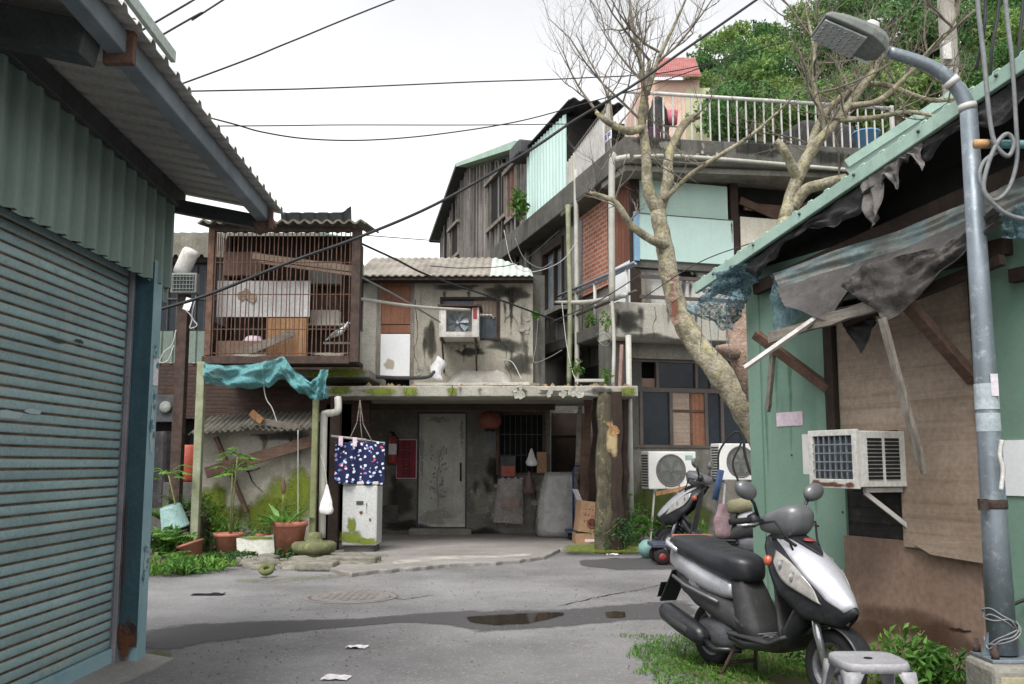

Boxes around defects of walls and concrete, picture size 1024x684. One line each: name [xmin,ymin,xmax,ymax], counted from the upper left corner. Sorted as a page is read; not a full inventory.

leakage [423,322,436,355]
leakage [438,285,533,374]
leakage [615,308,673,342]
corrosion [117,622,137,661]